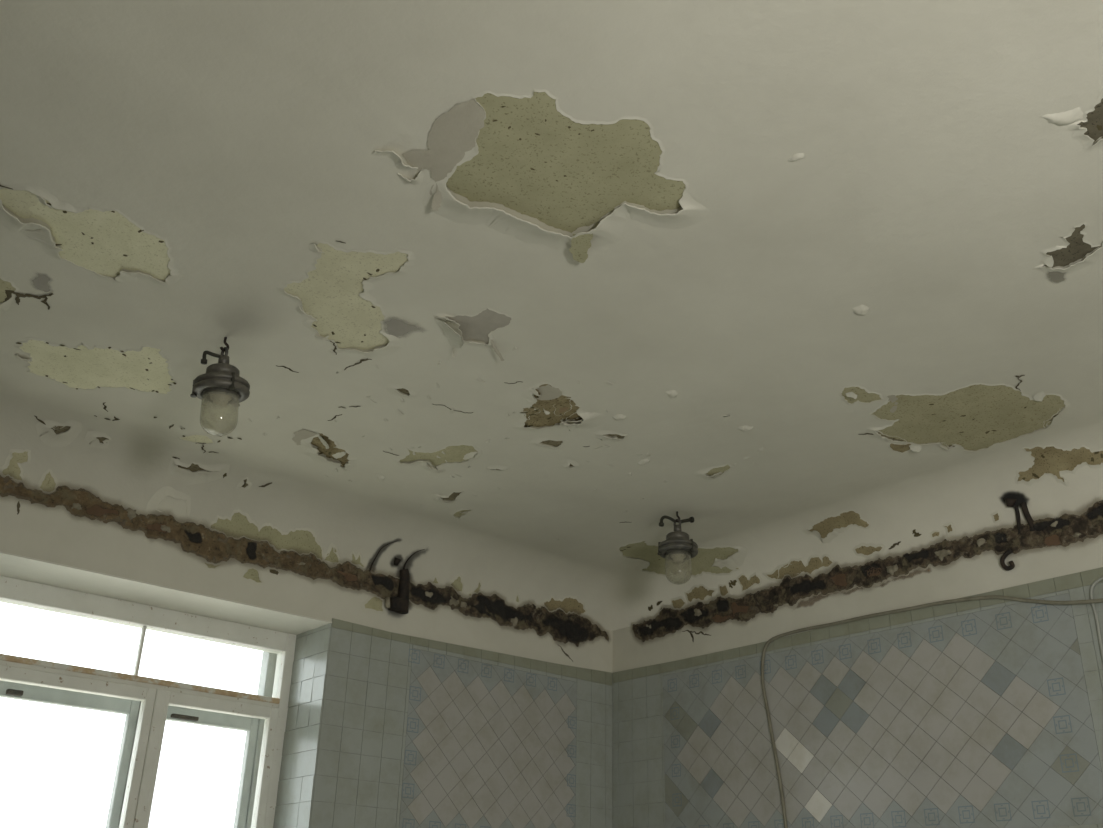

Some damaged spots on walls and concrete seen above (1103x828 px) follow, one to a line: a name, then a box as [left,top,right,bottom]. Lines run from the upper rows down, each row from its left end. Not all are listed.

peeling [1067,90,1103,152]
peeling [371,88,710,263]
peeling [0,276,53,314]
peeling [0,183,183,288]
peeling [276,240,417,358]
peeling [1033,221,1103,275]
peeling [146,424,242,520]
peeling [292,429,360,472]
peeling [512,381,631,450]
peeling [838,375,1103,486]
peeling [209,510,365,568]
peeling [617,509,871,611]